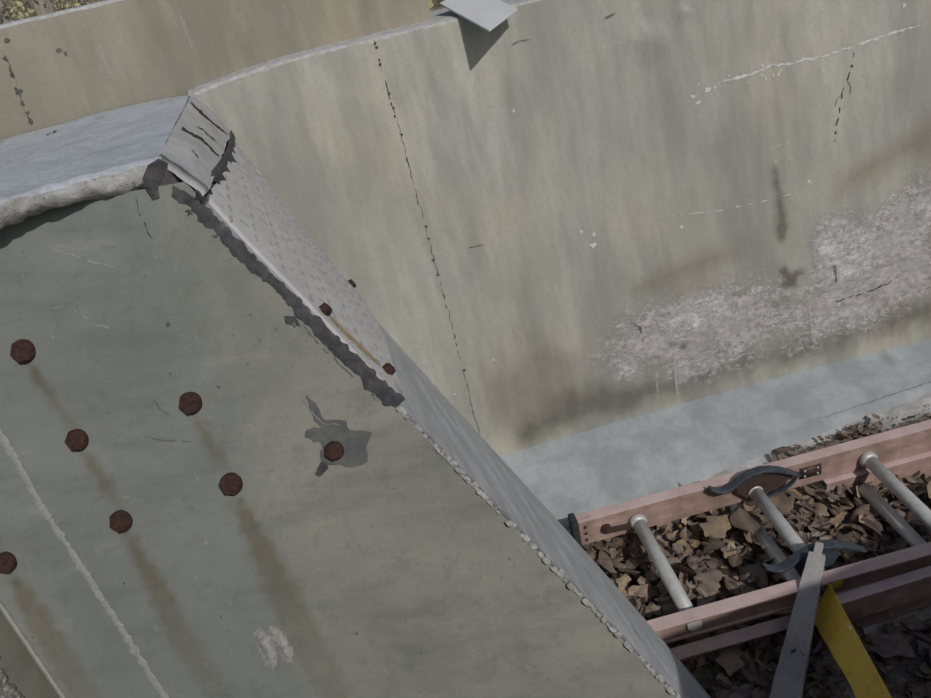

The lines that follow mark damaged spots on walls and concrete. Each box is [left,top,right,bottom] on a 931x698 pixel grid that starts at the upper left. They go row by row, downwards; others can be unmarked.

crack [374,40,480,434]
crack [834,56,854,142]
peeling [172,186,681,698]